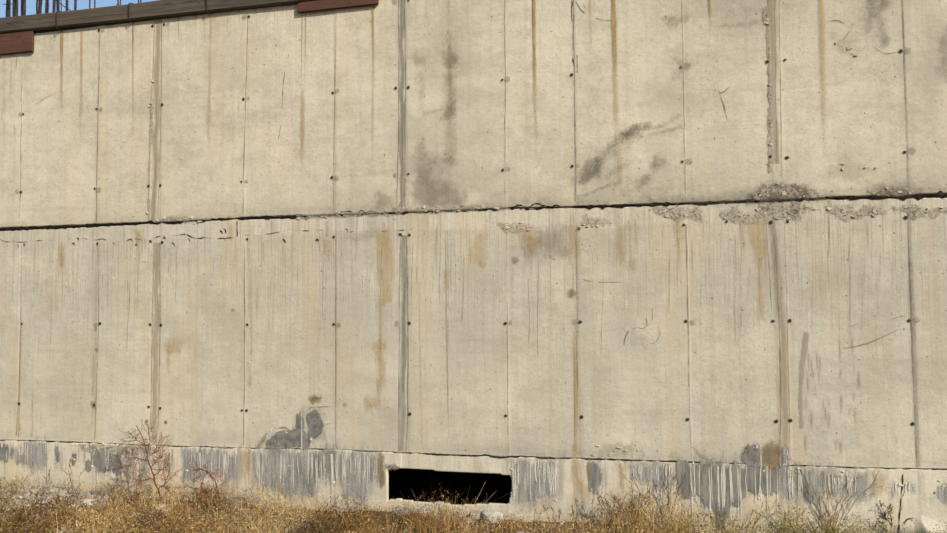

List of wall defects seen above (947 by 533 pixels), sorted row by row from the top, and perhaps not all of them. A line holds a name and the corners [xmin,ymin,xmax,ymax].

spalling [650,206,703,221]
spalling [720,6,947,226]